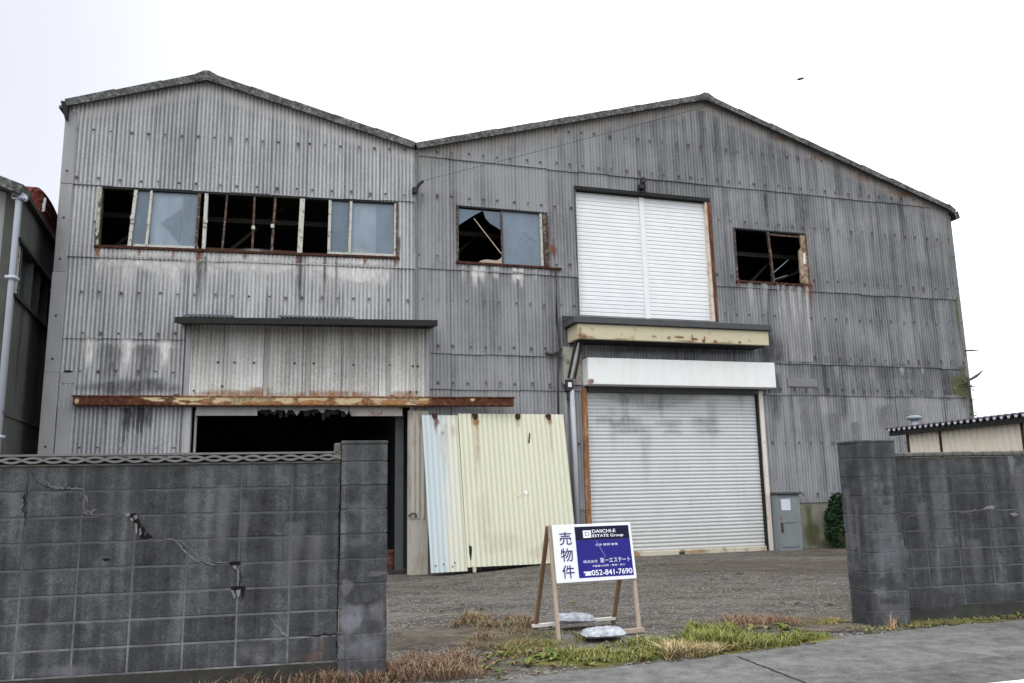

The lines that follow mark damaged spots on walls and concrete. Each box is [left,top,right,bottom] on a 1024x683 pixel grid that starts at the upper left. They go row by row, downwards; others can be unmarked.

water stain [462,266,499,283]
water stain [82,338,98,368]
water stain [112,339,173,370]
rust [206,388,274,404]
rust [300,392,361,404]
water stain [123,408,144,441]
crack [22,471,124,524]
crack [148,538,243,585]
crack [270,471,341,661]